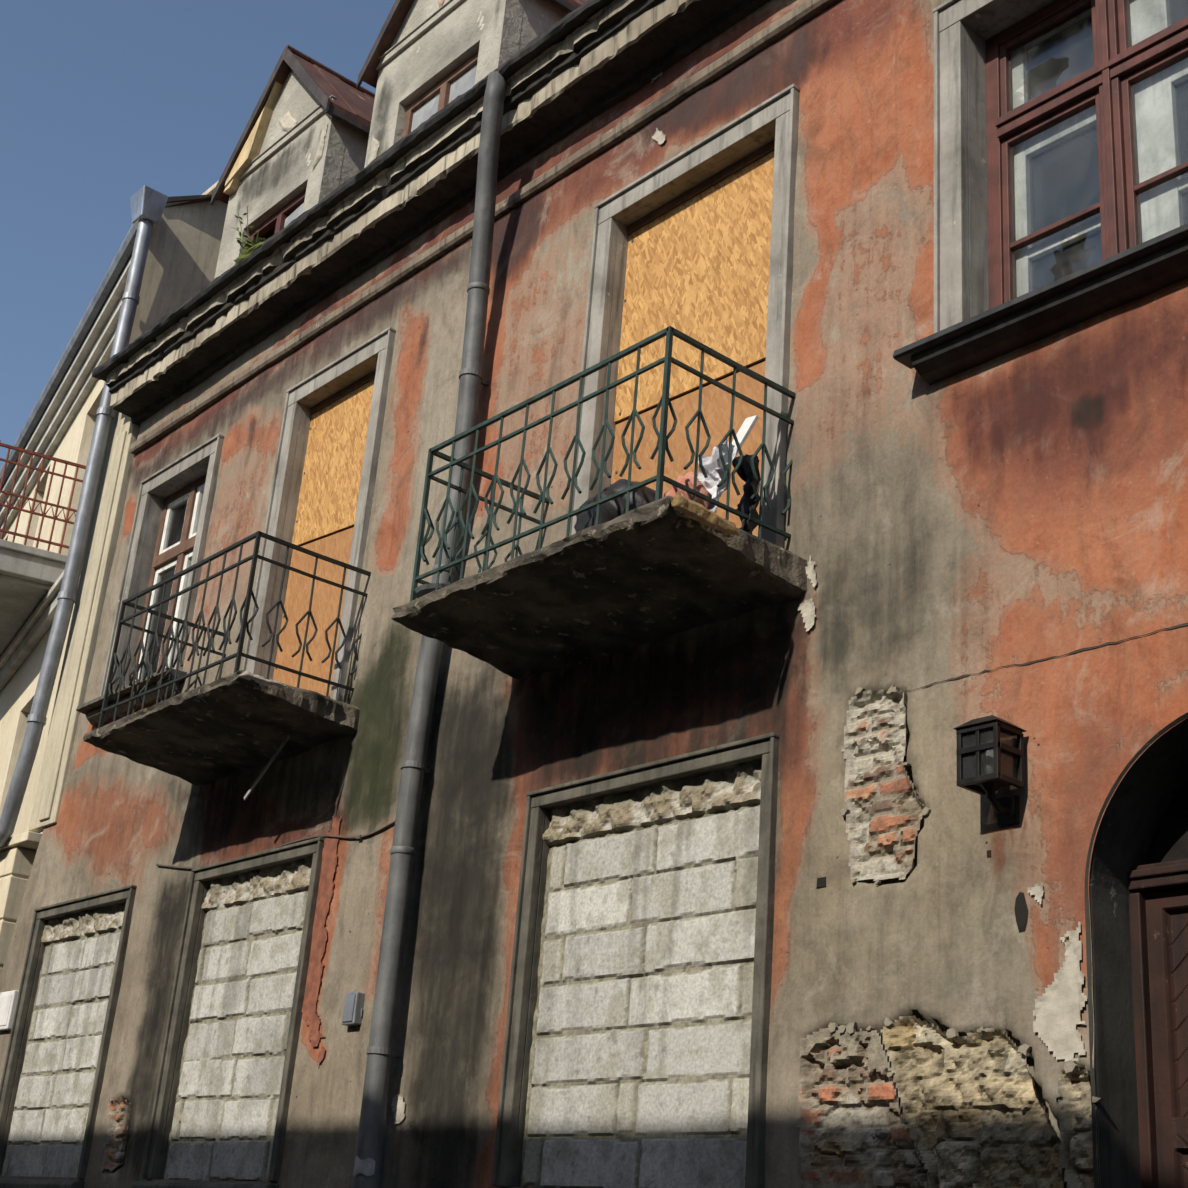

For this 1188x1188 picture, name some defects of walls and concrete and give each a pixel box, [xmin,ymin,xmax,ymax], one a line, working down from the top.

water stain [492,204,539,287]
water stain [533,605,805,782]
peeling [798,555,817,631]
crack [900,622,1188,693]
spalling [840,685,931,885]
peeling [301,816,342,1067]
water stain [411,670,510,1188]
spalling [1014,883,1044,932]
spalling [100,1097,131,1173]
spalling [798,922,1103,1188]